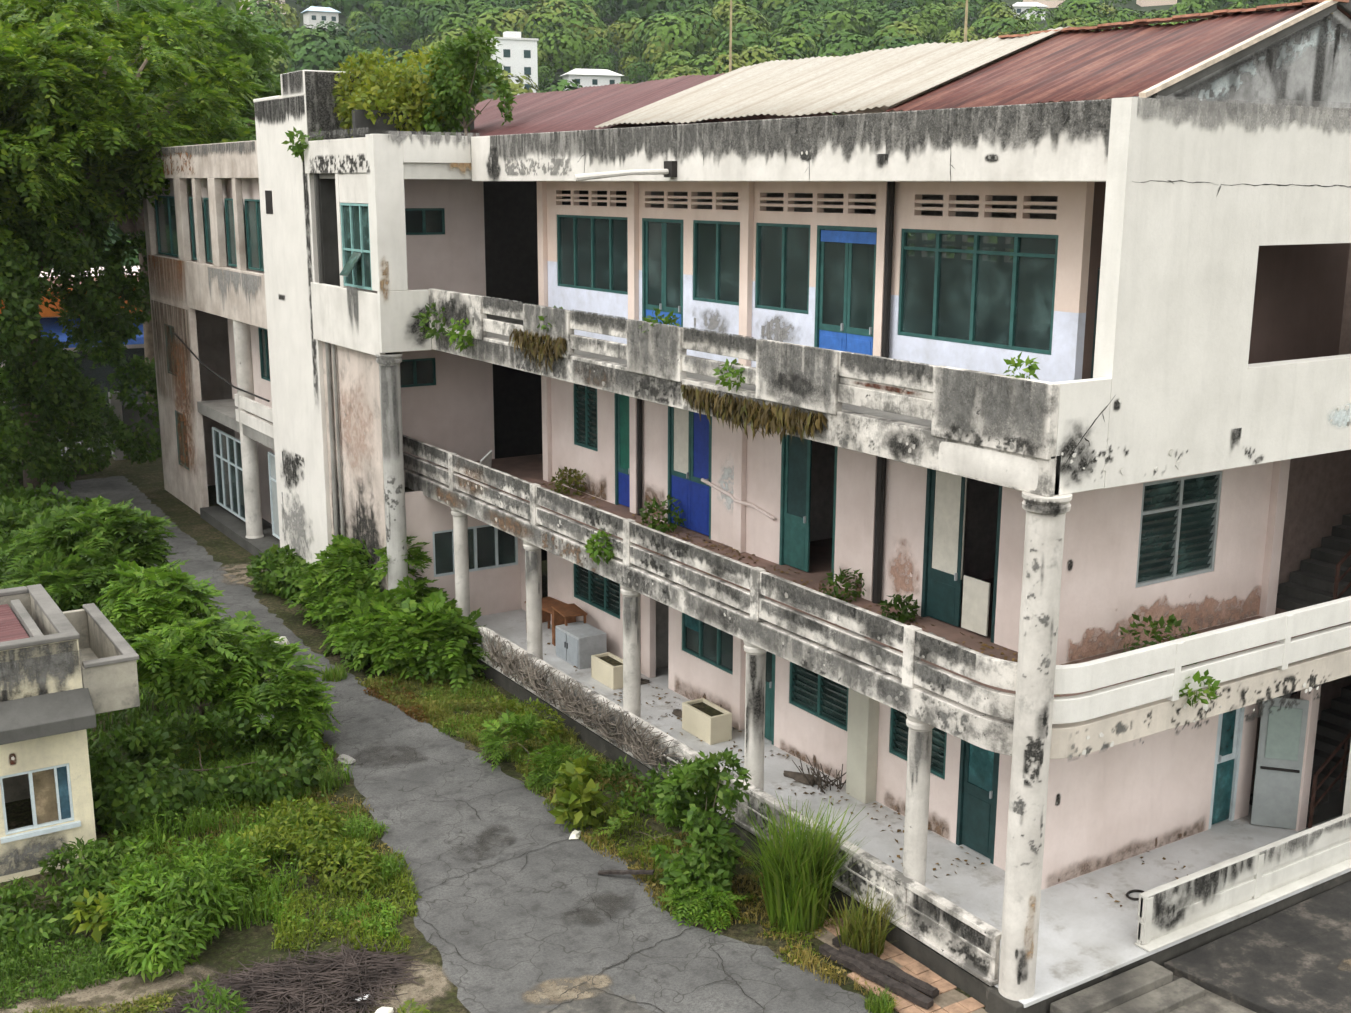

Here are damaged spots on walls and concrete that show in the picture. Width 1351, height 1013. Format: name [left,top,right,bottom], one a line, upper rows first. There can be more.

damp [388,99,1112,181]
crack [1133,180,1351,195]
damp [408,296,1047,445]
spalling [1058,429,1129,482]
damp [282,451,310,558]
damp [377,356,976,747]
peeling [1025,589,1261,661]
damp [0,640,80,702]
spalling [1171,671,1326,734]
spalling [1013,708,1048,814]
damp [1153,817,1351,929]
spalling [1015,949,1027,985]